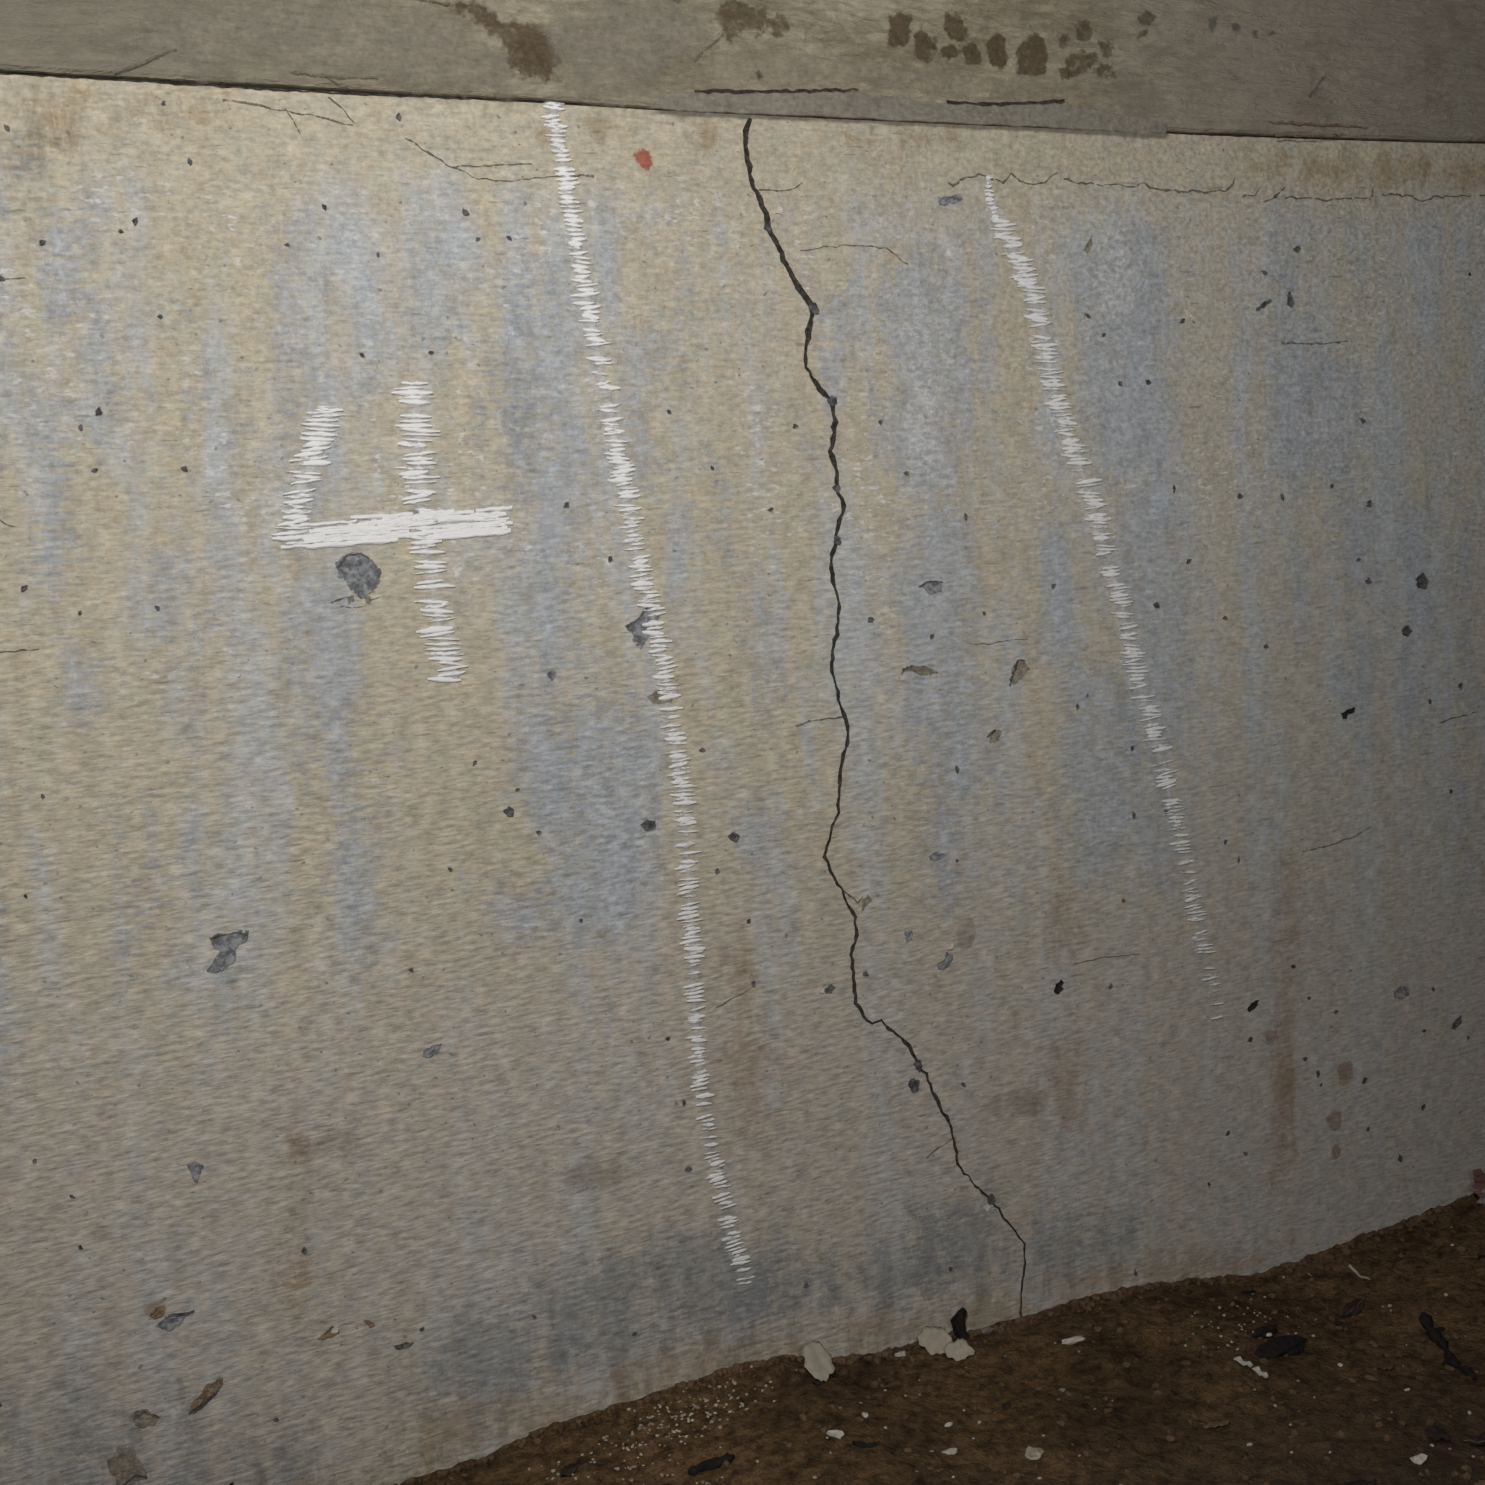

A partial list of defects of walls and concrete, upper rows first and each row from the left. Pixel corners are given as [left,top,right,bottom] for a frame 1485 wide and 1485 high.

damp [495,261,584,668]
damp [497,704,663,944]
crack [694,33,1026,1317]
damp [874,205,991,914]
damp [1060,485,1191,883]
damp [1075,211,1179,479]
damp [1269,213,1361,484]